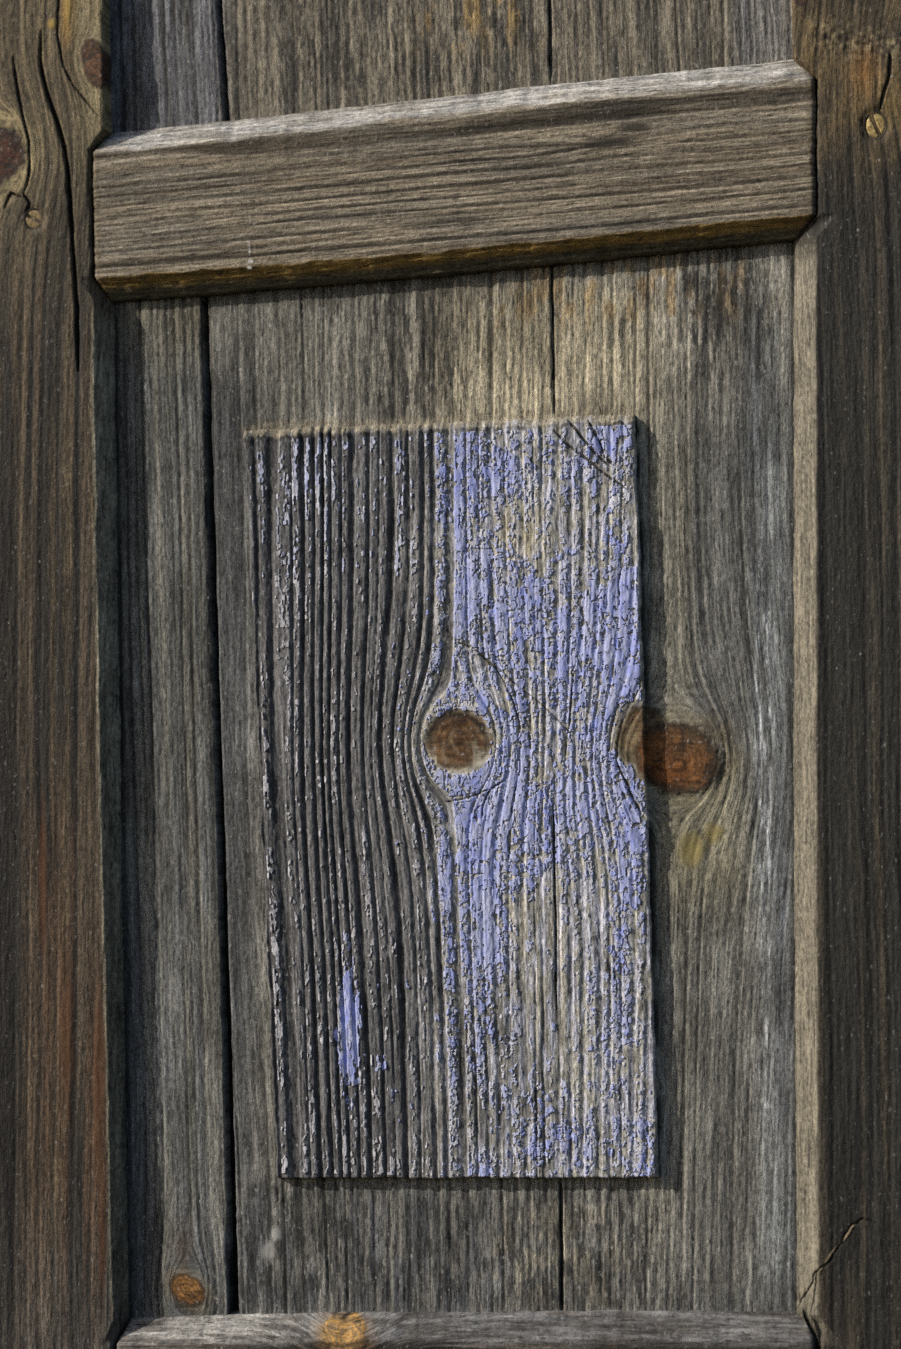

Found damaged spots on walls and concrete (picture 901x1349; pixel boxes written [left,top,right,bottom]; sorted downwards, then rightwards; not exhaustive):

crack [550,272,624,488]
peeling [250,425,655,1177]
crack [551,814,559,1004]
crack [558,1181,566,1306]
crack [797,1218,872,1349]